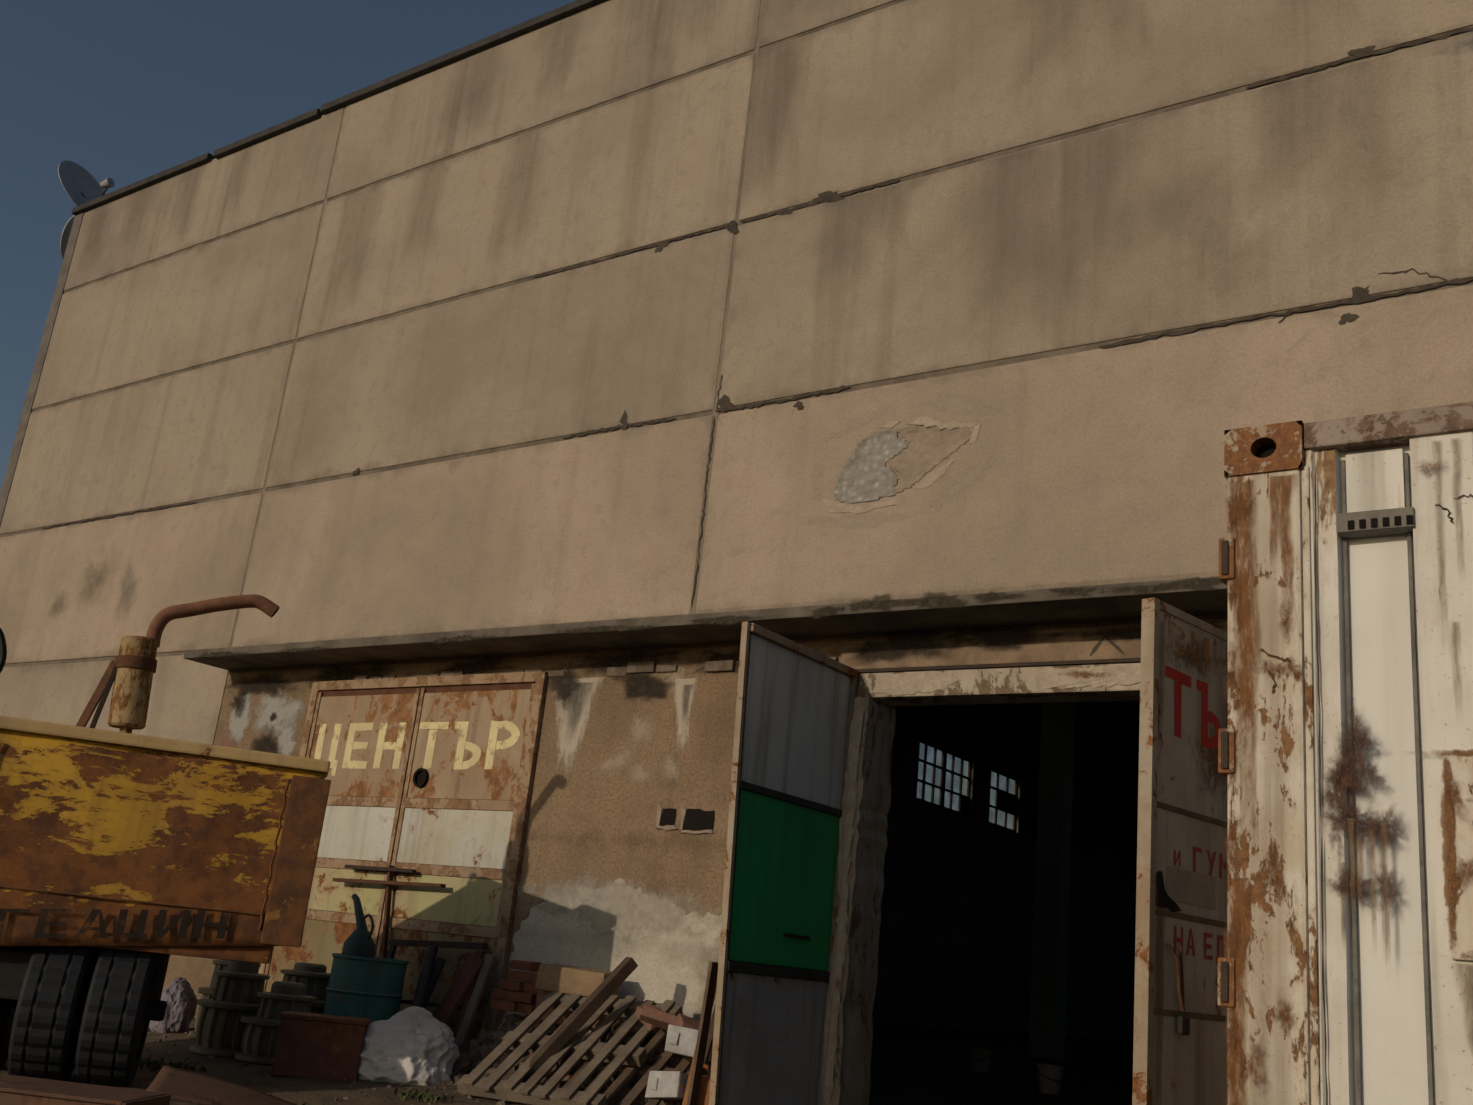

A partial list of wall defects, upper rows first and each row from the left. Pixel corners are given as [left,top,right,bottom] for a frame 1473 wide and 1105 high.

crack [1099,268,1473,348]
spalling [814,398,983,525]
rust [1197,475,1296,796]
leakage [555,677,603,766]
leakage [603,668,696,781]
flaking render [503,878,722,1031]
rust [1224,878,1264,1105]
rust [1278,1005,1292,1026]
rust [1323,709,1400,946]
rust [1422,749,1473,1041]